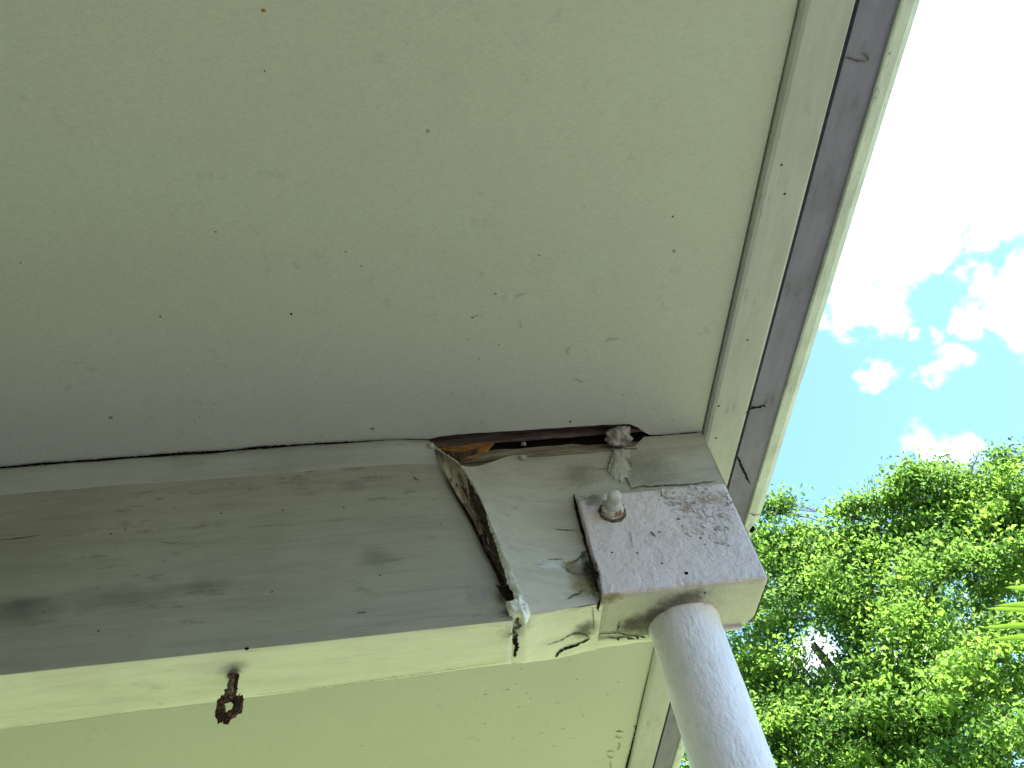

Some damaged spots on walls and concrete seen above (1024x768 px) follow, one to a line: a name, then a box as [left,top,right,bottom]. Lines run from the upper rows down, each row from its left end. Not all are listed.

crack [0,439,424,468]
peeling [658,483,734,546]
leakage [577,555,601,595]
crack [548,483,646,657]
leakage [622,592,701,632]
corrosion [215,673,244,725]